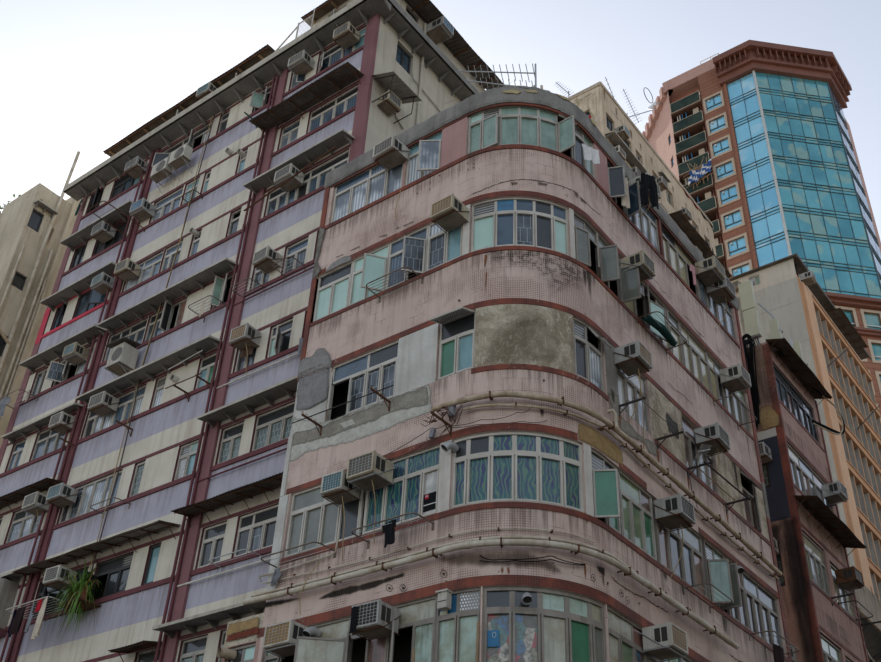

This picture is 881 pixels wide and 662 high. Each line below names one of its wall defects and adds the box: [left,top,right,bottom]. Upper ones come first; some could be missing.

crack [466,179,600,215]
damp [492,250,595,291]
peeling [289,385,432,461]